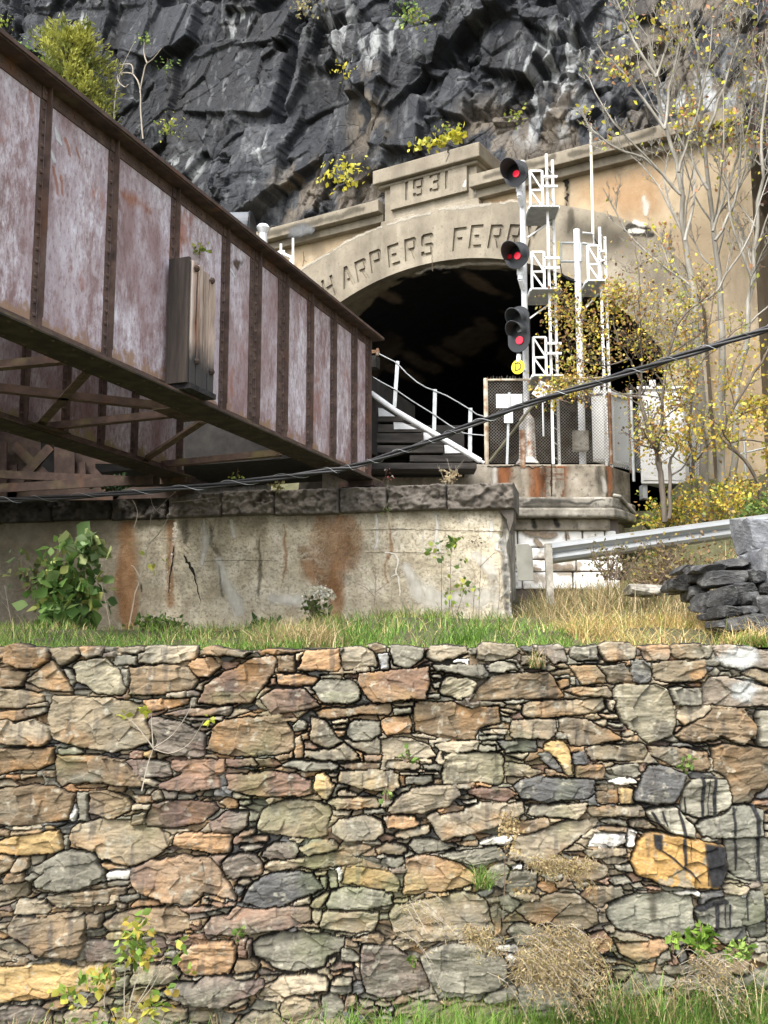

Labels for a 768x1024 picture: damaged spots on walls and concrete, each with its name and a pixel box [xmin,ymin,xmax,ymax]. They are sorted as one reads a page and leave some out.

corrosion [497,467,516,483]
corrosion [530,466,567,497]
crack [167,522,271,603]
corrosion [300,515,361,621]
crack [365,529,504,596]